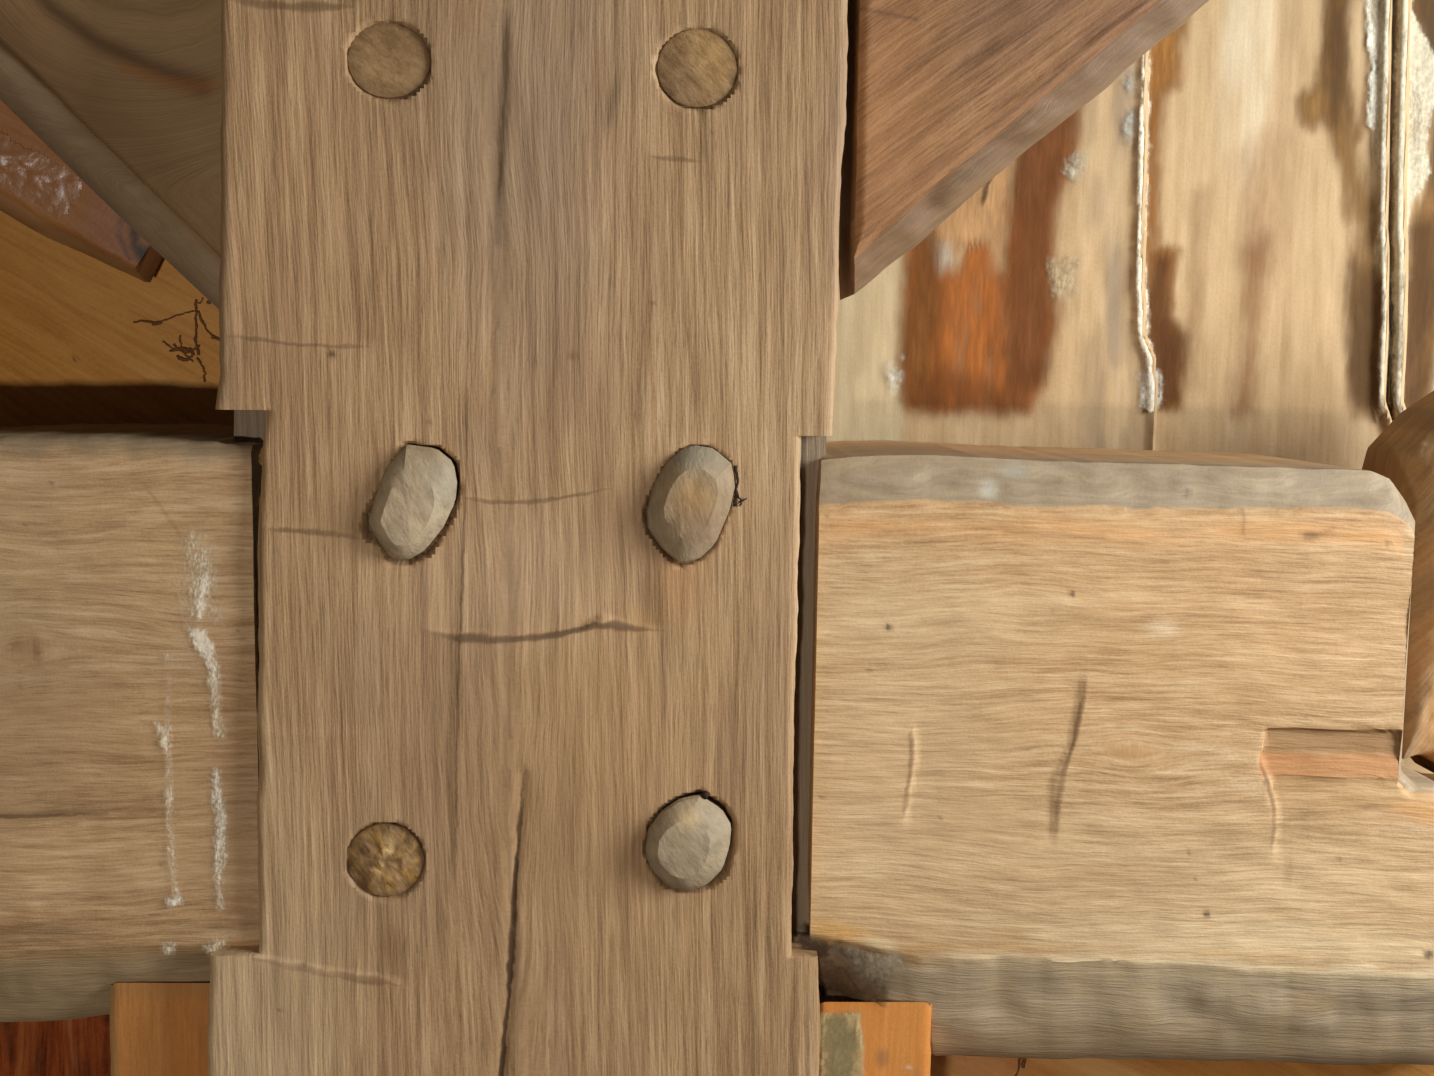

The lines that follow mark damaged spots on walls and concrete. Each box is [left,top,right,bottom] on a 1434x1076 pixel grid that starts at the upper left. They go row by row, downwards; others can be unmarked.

damp [1413,0,1434,54]
damp [934,166,1008,267]
damp [1300,0,1384,414]
damp [1400,160,1434,411]
damp [188,572,224,737]
damp [154,723,181,906]
crack [499,802,523,1076]